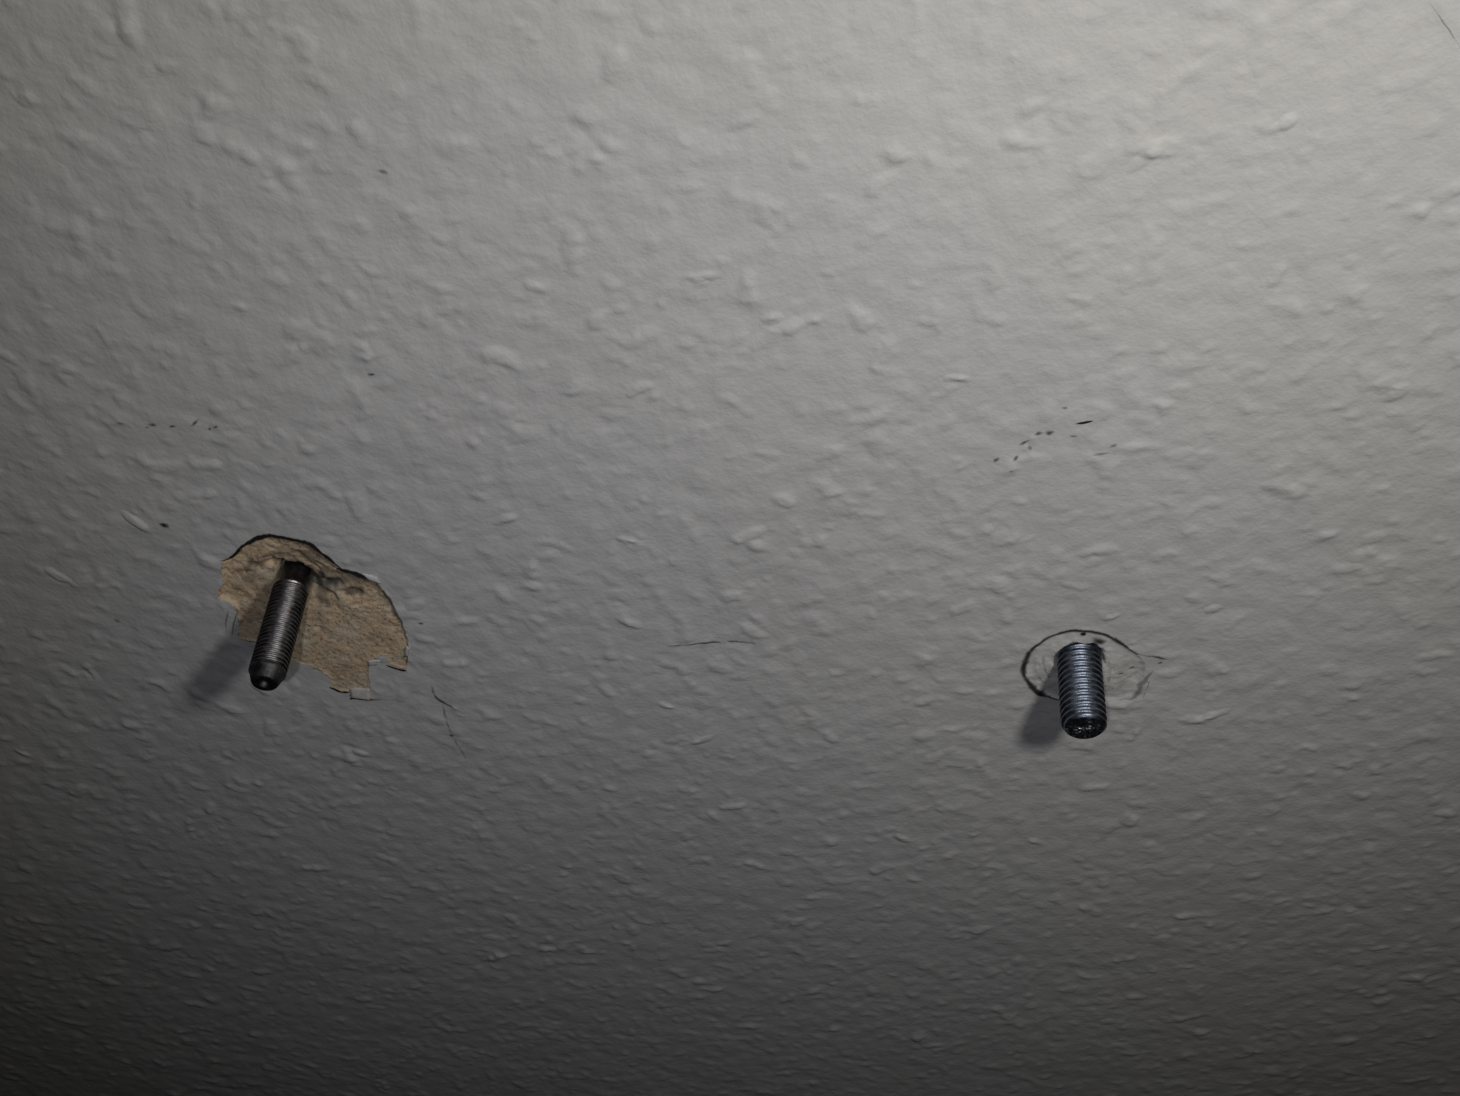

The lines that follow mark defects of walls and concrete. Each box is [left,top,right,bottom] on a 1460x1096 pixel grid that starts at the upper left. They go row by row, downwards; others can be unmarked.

flaking render [217,534,409,701]